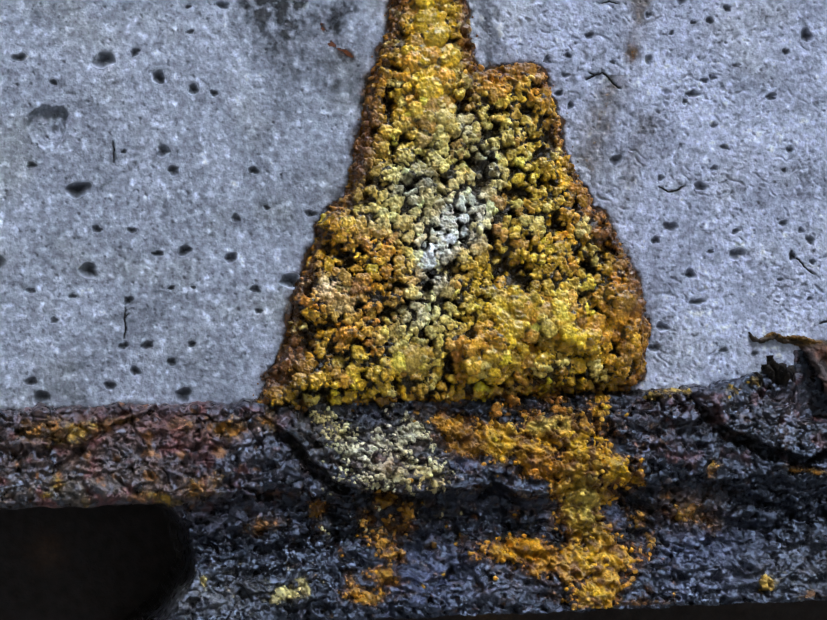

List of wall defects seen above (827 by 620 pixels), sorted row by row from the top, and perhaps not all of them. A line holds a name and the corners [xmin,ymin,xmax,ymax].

rust [320,2,356,60]
rust [22,415,135,442]